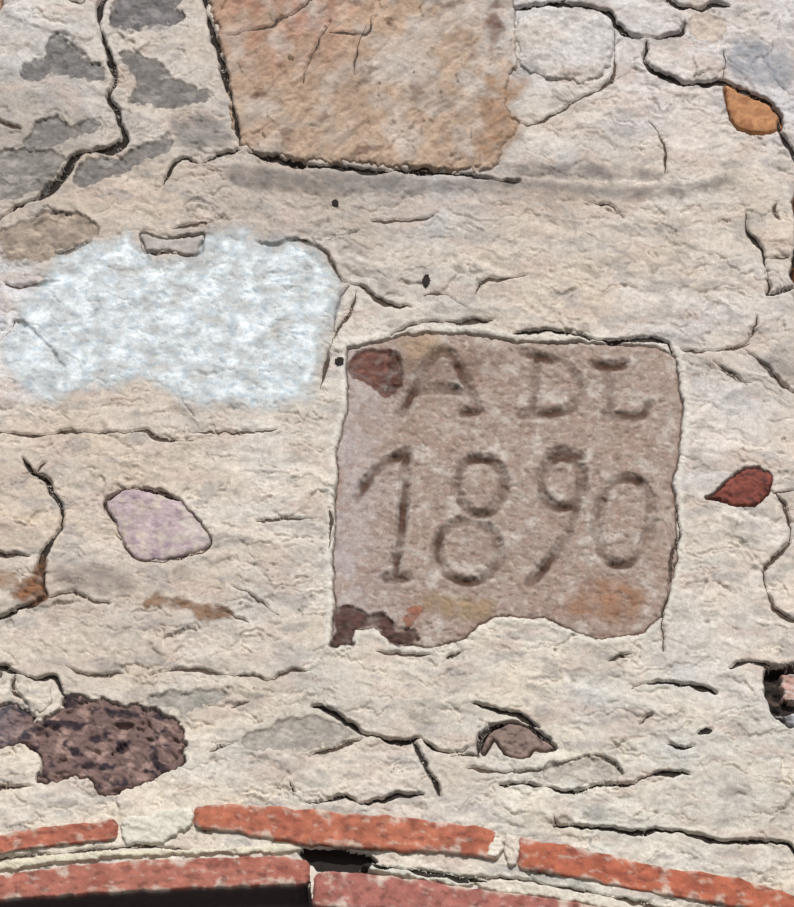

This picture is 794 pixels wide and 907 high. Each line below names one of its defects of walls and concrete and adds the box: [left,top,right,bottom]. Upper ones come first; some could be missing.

crack [0,0,129,220]
crack [163,0,519,186]
crack [513,0,794,162]
crack [255,212,528,390]
crack [513,317,794,393]
crack [745,213,794,296]
crack [0,398,278,623]
crack [762,490,794,623]
crack [290,703,712,806]
crack [631,682,716,695]
spalling [763,670,794,729]
crack [554,817,794,854]